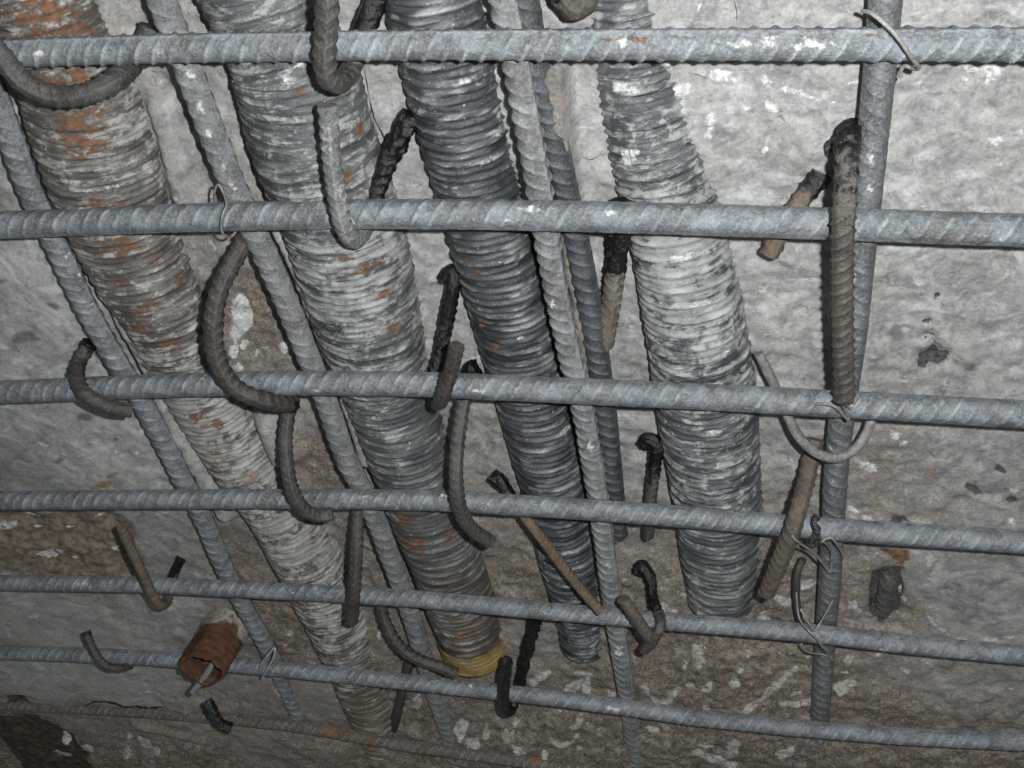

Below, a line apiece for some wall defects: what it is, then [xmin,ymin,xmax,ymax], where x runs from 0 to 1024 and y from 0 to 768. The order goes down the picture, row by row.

rust [3,0,96,38]
rust [51,108,109,159]
spalling [0,0,500,746]
spalling [300,0,1024,768]
spalling [0,695,91,768]